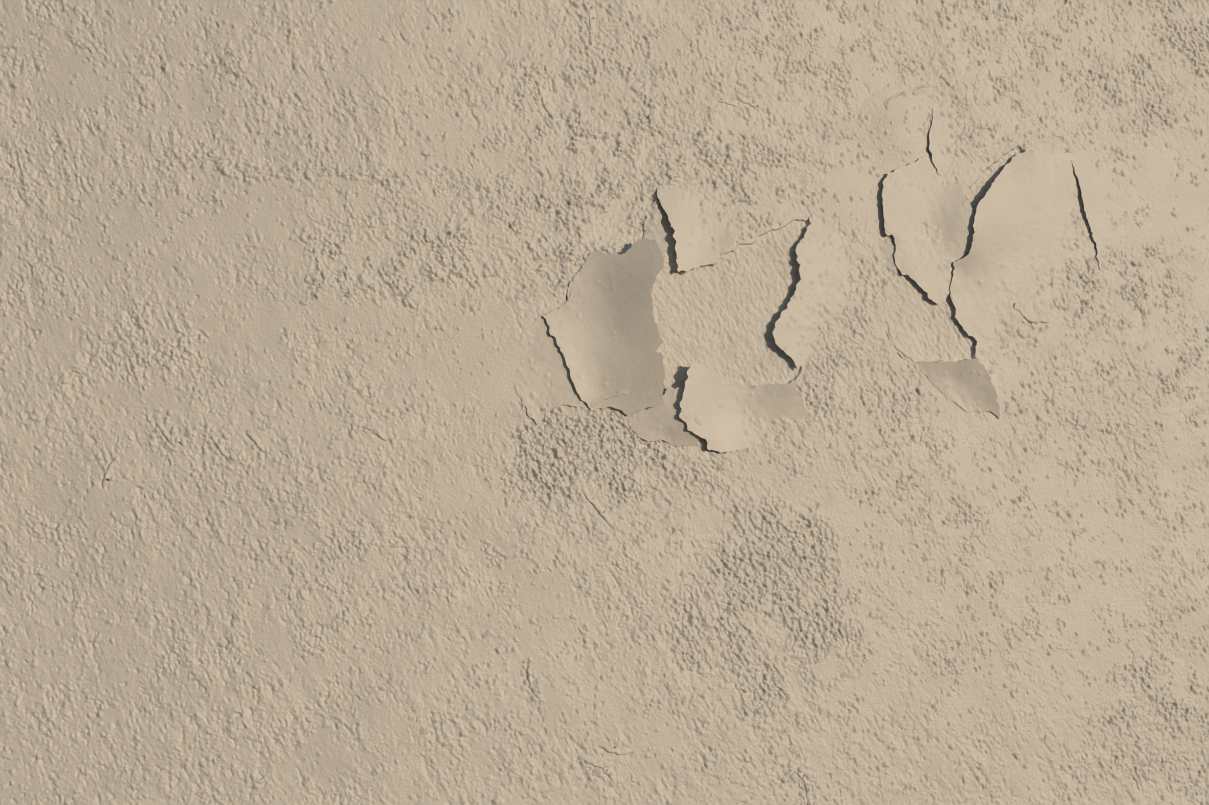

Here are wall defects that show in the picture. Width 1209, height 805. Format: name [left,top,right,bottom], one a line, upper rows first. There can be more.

peeling [514,185,867,453]
peeling [879,106,1130,419]